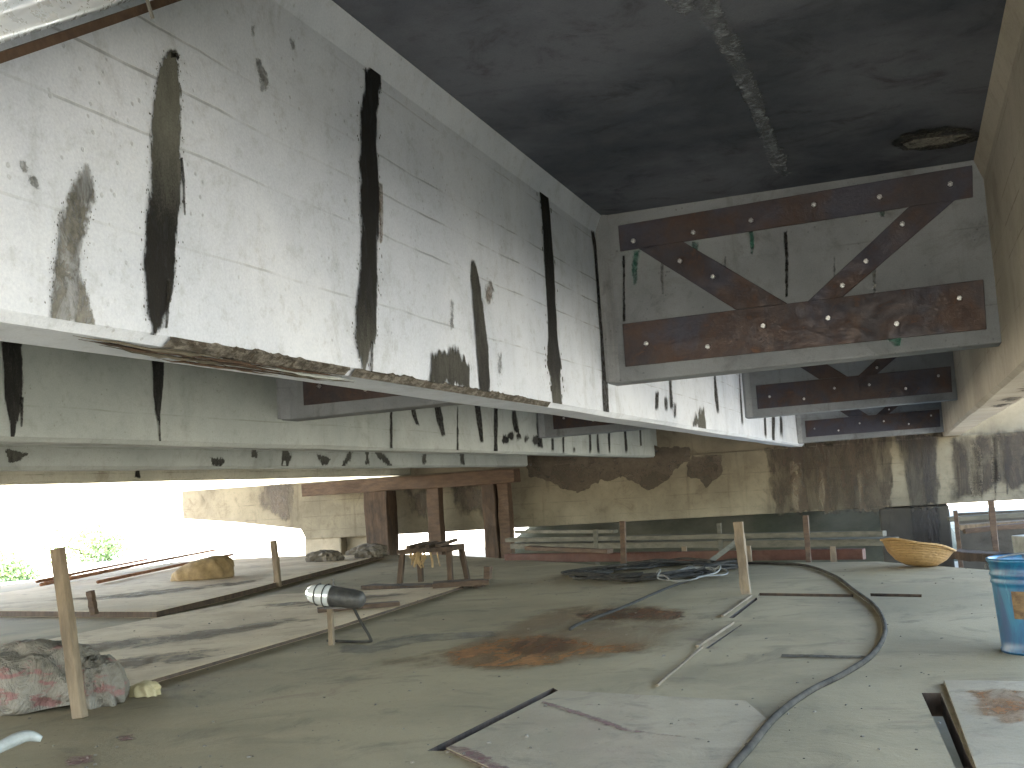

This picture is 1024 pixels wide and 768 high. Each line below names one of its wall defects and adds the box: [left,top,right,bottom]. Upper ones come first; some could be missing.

spalling [894,126,980,151]
damp [44,165,98,325]
spalling [73,335,551,407]
damp [430,347,470,389]
peeling [526,445,723,493]
damp [765,433,941,544]
damp [952,431,1024,504]